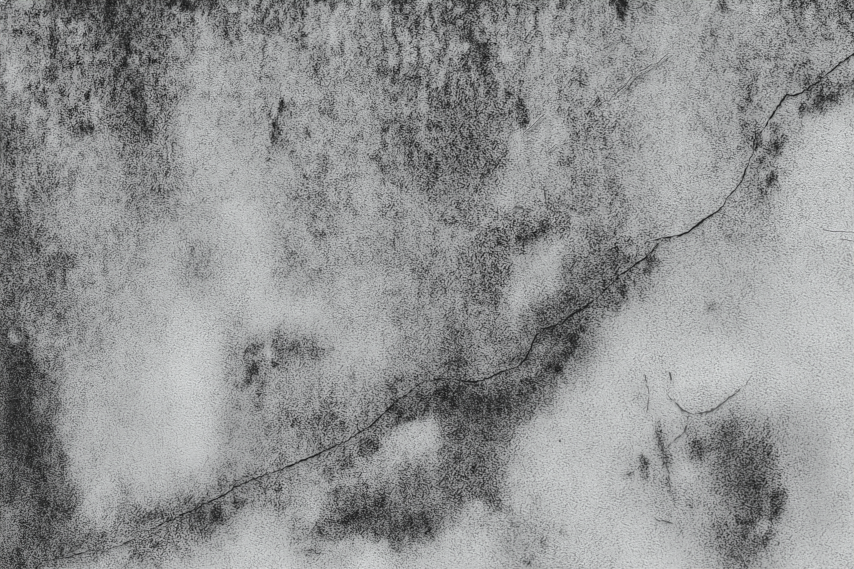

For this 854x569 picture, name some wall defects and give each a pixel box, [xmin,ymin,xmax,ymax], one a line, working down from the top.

leakage [769,0,854,117]
leakage [738,60,788,208]
leakage [0,0,663,569]
crack [456,53,854,383]
crack [36,378,448,569]
leakage [621,421,673,479]
crack [637,372,750,492]
leakage [687,419,788,569]